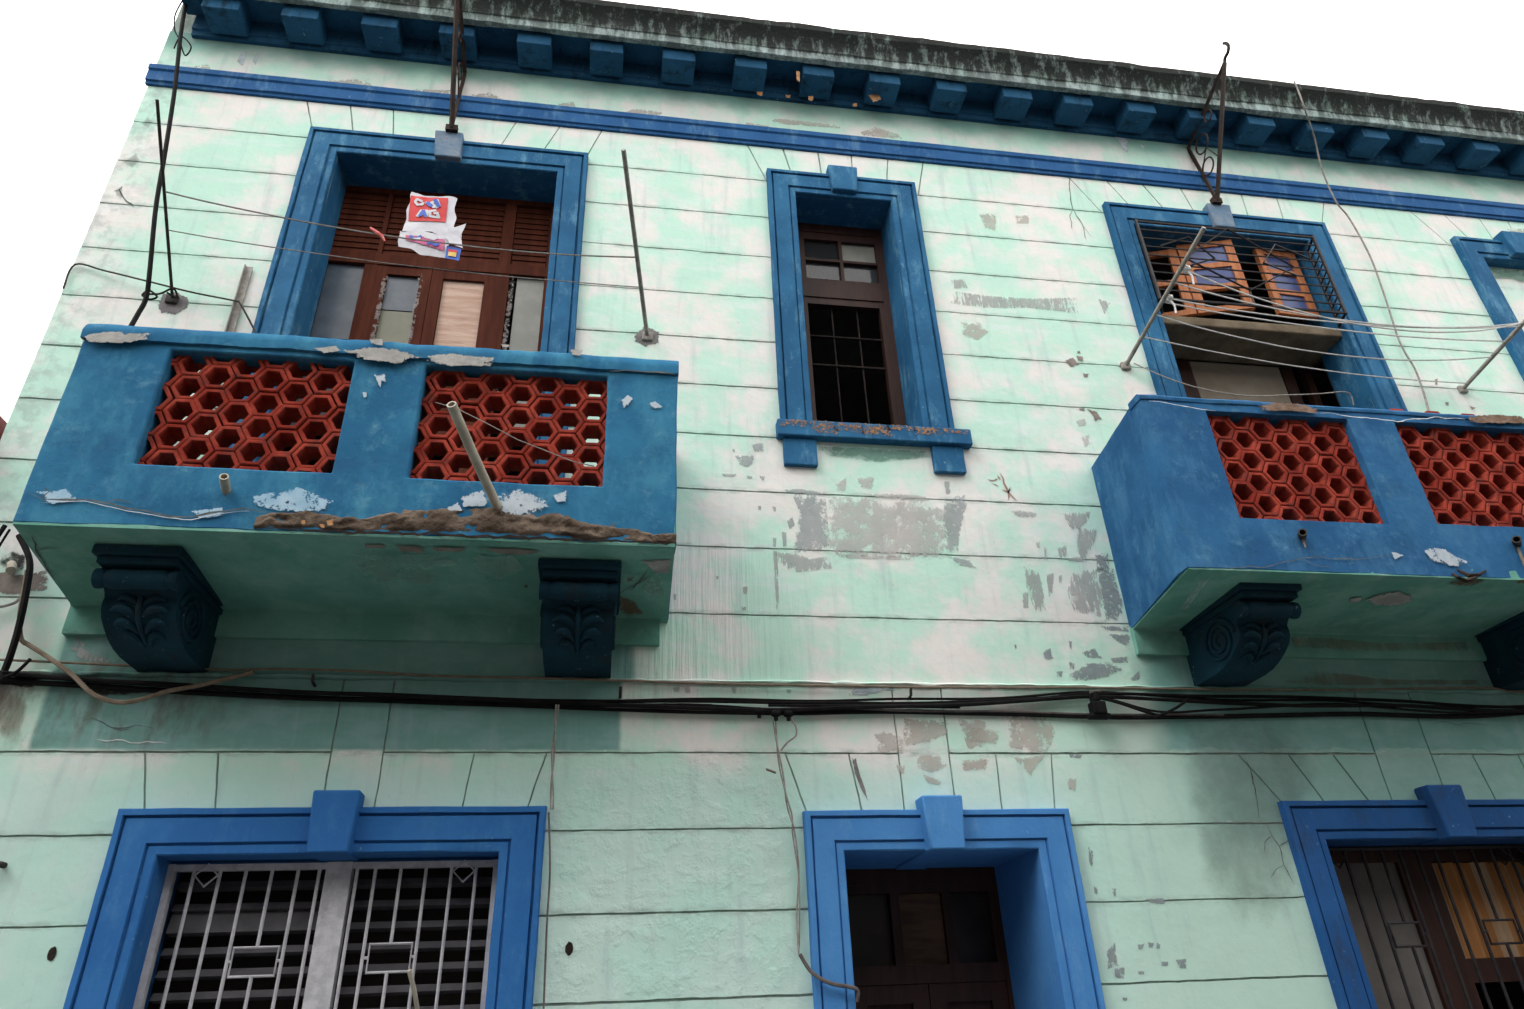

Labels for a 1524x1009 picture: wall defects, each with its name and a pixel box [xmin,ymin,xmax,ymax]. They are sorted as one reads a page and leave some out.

peeling [980,214,996,230]
spalling [82,332,149,343]
peeling [954,279,1078,340]
peeling [37,489,76,504]
peeling [192,508,222,518]
spalling [253,487,676,573]
peeling [758,477,976,608]
peeling [1023,512,1139,681]
peeling [875,716,1054,784]